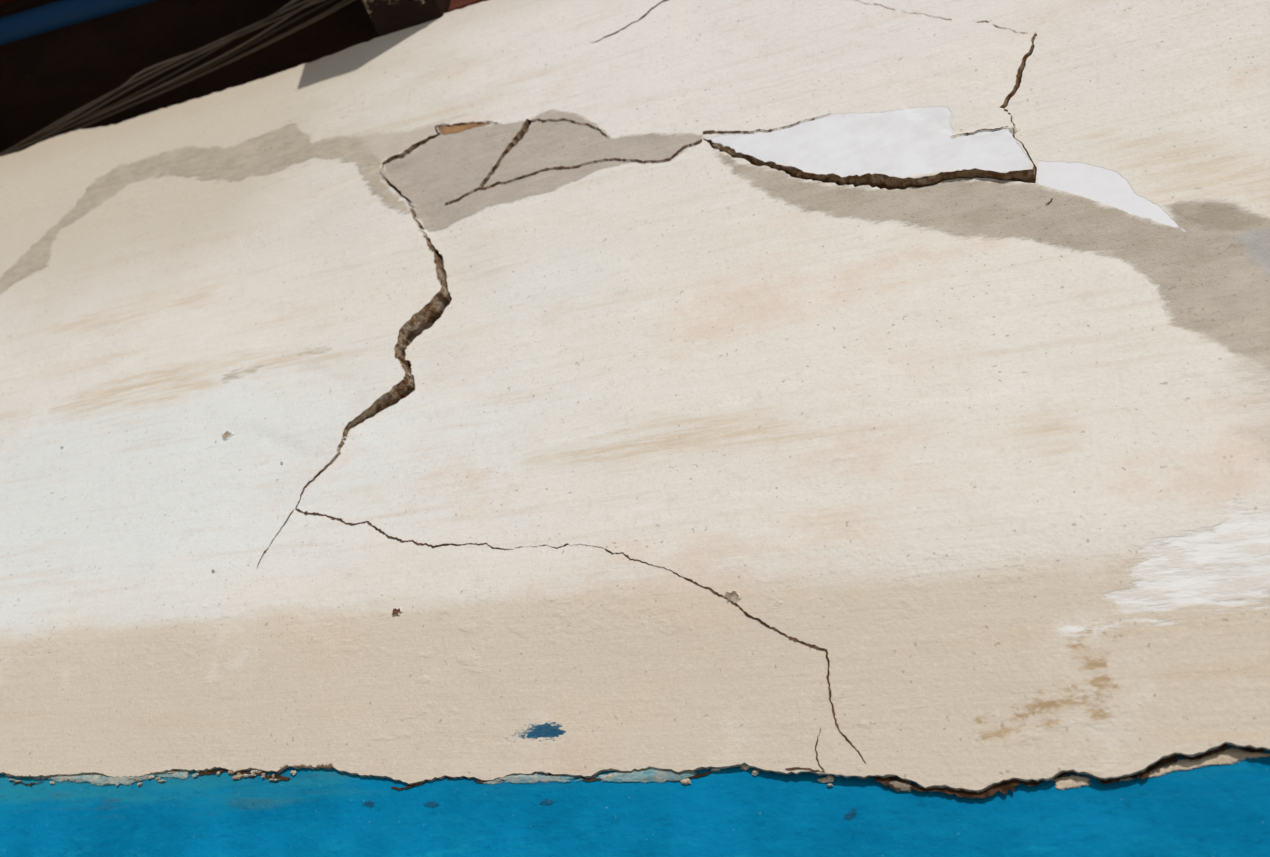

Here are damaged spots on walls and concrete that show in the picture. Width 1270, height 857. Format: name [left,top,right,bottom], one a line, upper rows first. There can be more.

crack [591,0,667,43]
peeling [0,33,1270,354]
crack [257,113,1265,798]
damp [1137,276,1270,475]
spalling [267,752,348,771]
spalling [889,781,912,791]